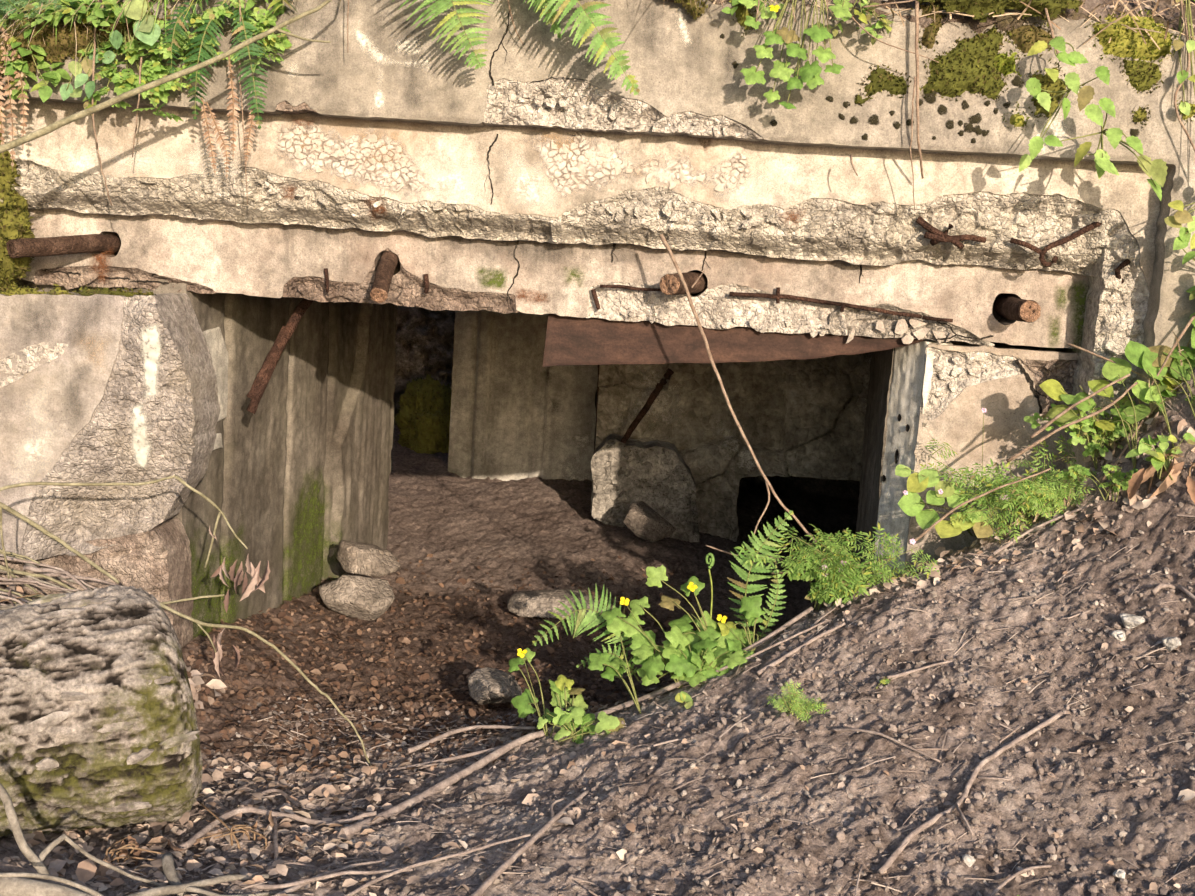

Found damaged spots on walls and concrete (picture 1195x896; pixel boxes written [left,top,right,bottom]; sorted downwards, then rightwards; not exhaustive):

spalling [483,77,763,141]
rust [915,216,986,250]
rust [1010,222,1102,267]
spalling [11,159,1149,428]
rust [729,287,953,322]
spalling [20,265,228,561]